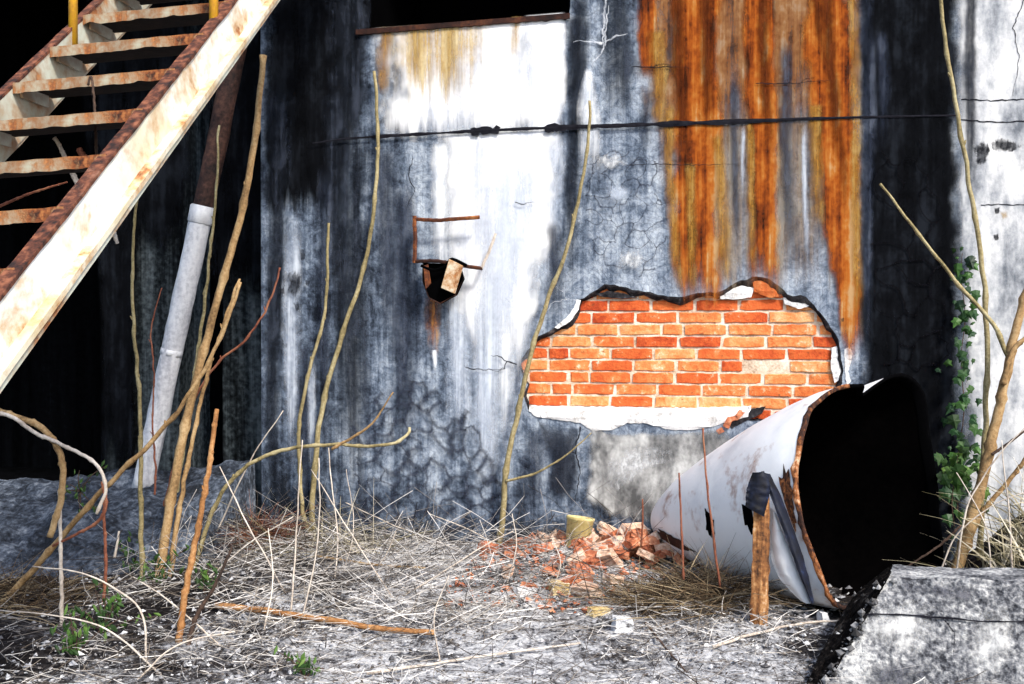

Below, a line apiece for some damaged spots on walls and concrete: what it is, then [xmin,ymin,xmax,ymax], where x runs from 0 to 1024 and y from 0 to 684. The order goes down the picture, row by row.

damp [207,90,217,122]
damp [209,0,368,487]
crack [351,379,510,542]
corrosion [429,299,438,367]
spalling [424,263,465,304]
damp [378,0,588,445]
crack [312,0,1024,372]
spalling [519,277,852,434]
corrosion [638,0,863,354]
damp [861,0,962,561]